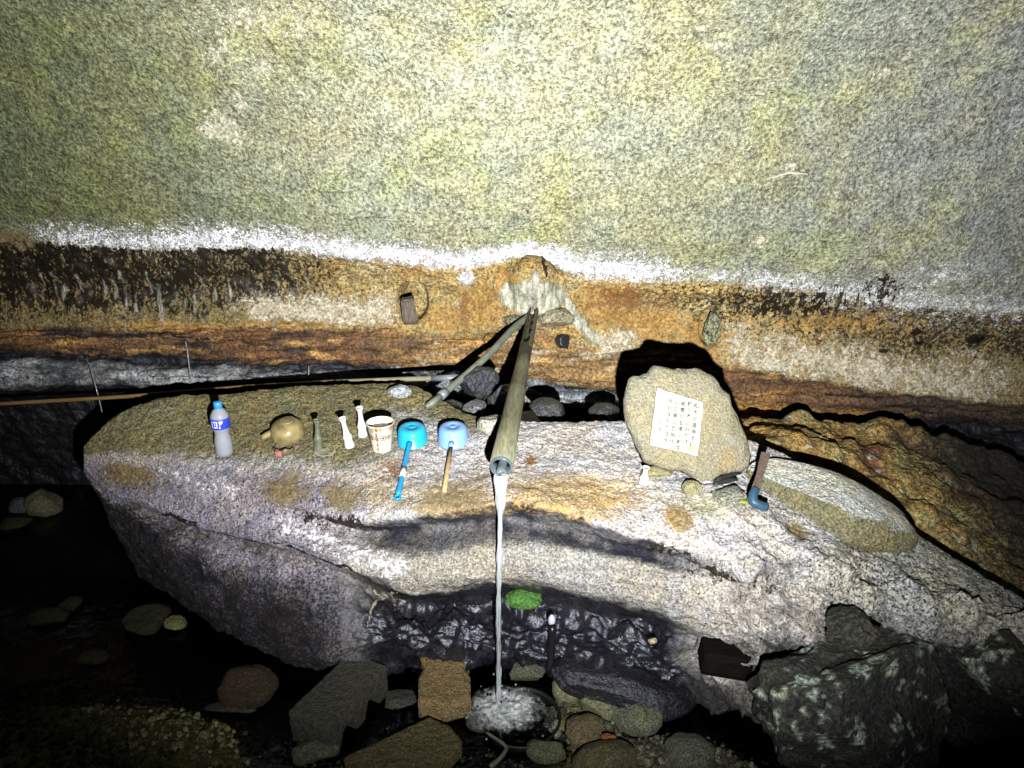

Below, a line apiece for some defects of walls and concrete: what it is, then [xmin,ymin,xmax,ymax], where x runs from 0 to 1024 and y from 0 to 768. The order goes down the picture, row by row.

water stain [0,217,1024,402]